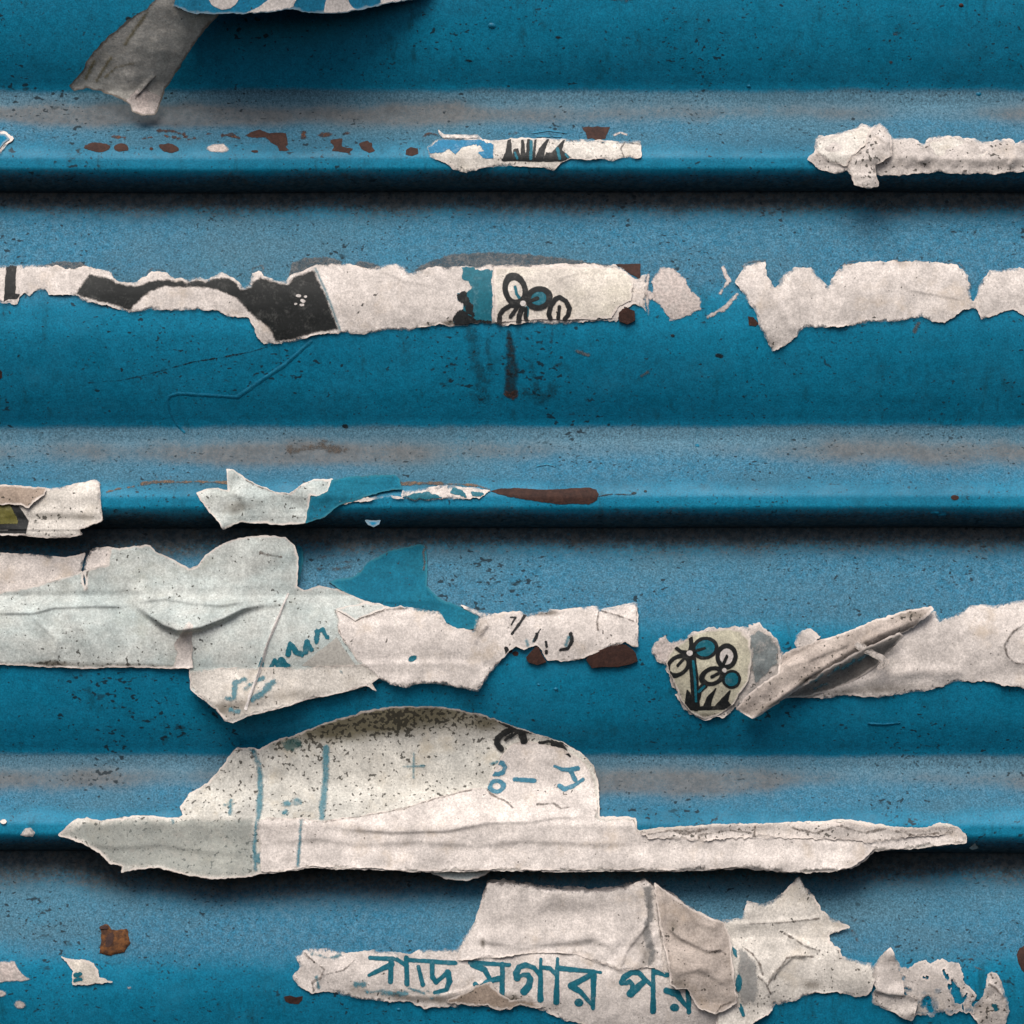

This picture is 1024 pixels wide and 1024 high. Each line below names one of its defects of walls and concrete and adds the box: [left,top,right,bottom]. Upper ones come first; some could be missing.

rust [84,135,128,152]
rust [143,129,289,153]
rust [301,131,375,153]
rust [583,126,610,140]
rust [491,487,599,504]
rust [509,646,546,665]
rust [586,644,638,668]
rust [99,924,130,956]